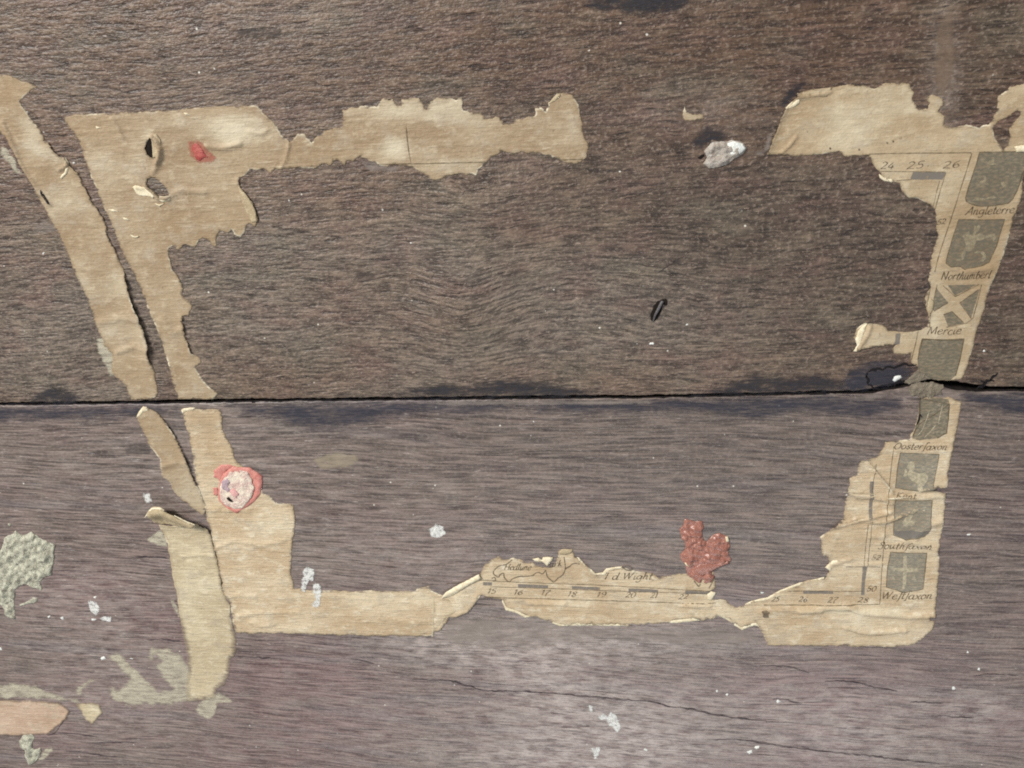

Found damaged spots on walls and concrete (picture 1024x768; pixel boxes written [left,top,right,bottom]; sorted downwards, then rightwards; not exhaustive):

peeling [682,107,704,121]
spalling [650,299,664,322]
crack [976,373,998,389]
peeling [77,703,102,723]
crack [413,679,931,763]